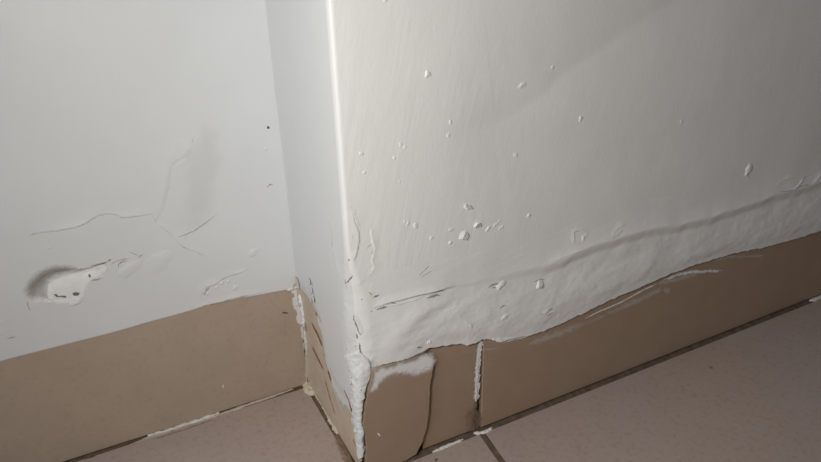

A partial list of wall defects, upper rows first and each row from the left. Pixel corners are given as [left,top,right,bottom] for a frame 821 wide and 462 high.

flaking render [19,259,112,308]
spalling [335,206,435,462]